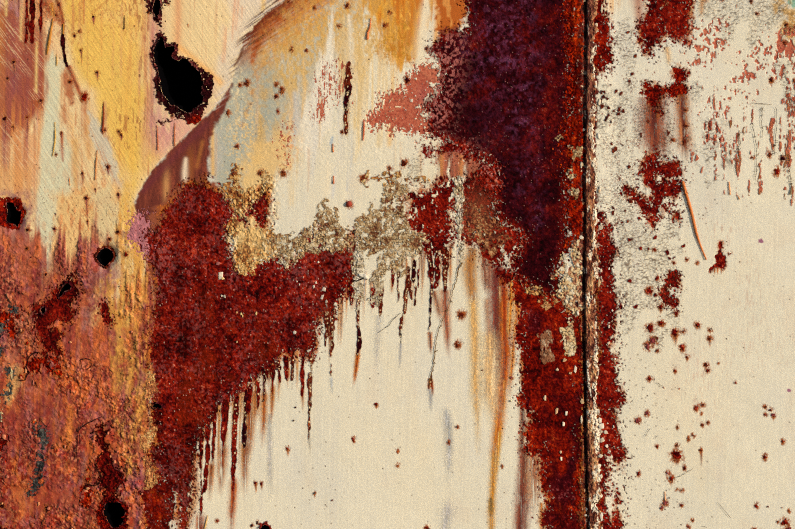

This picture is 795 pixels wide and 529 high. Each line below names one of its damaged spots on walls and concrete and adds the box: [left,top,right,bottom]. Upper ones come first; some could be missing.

corrosion [617,0,706,233]
peeling [713,84,795,206]
corrosion [0,263,86,387]
peeling [218,163,430,312]
corrosion [79,0,650,529]
corrosion [660,433,696,510]